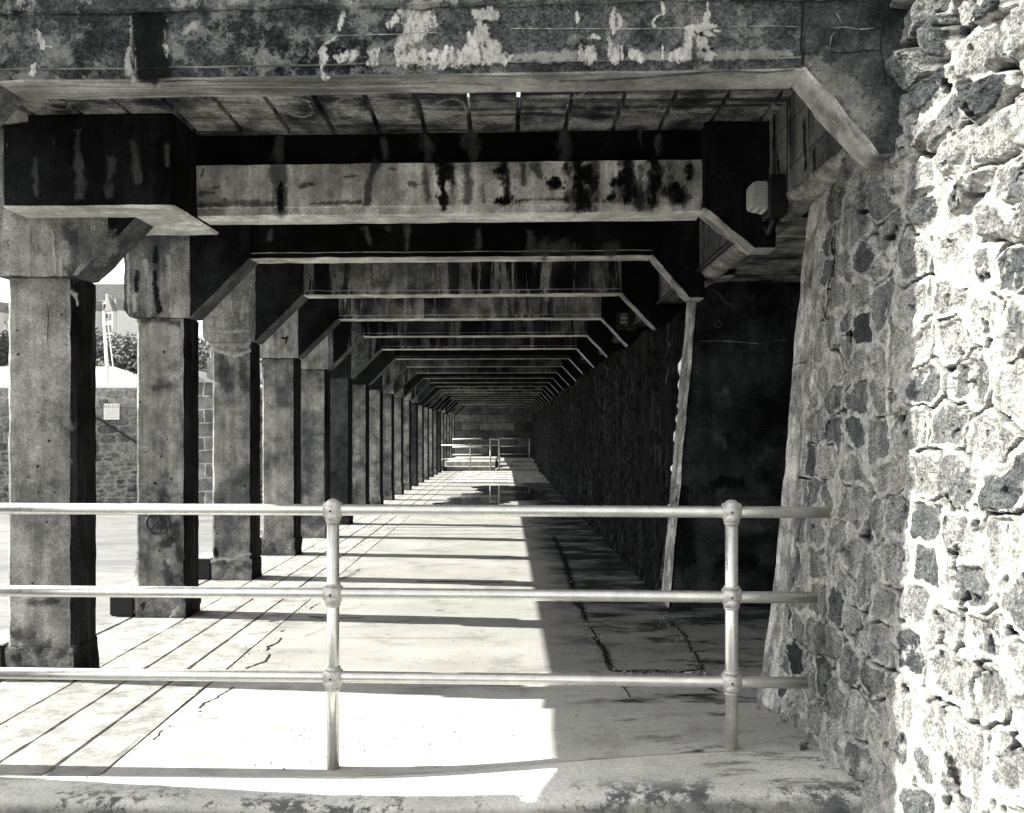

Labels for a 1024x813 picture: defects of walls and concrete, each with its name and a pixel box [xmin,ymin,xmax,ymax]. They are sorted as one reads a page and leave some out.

peeling [333,47,380,67]
peeling [385,11,477,70]
water stain [3,1,795,217]
water stain [803,119,815,178]
crack [563,557,704,698]